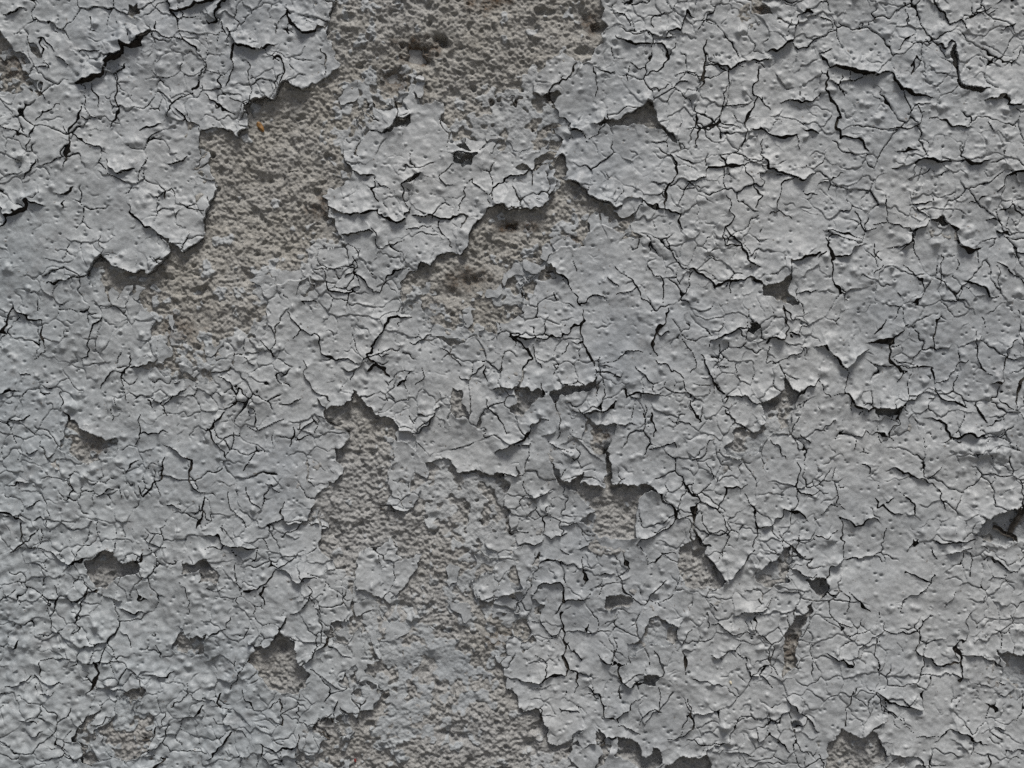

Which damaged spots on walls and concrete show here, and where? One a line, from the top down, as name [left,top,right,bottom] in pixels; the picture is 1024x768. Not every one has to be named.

crack [0,271,89,425]
crack [77,304,107,365]
crack [0,0,331,244]
peeling [71,0,693,384]
crack [201,0,1024,464]
peeling [73,536,156,600]
crack [0,351,351,768]
peeling [241,620,324,709]
crack [373,503,414,573]
peeling [291,360,718,768]
crack [407,228,1024,768]